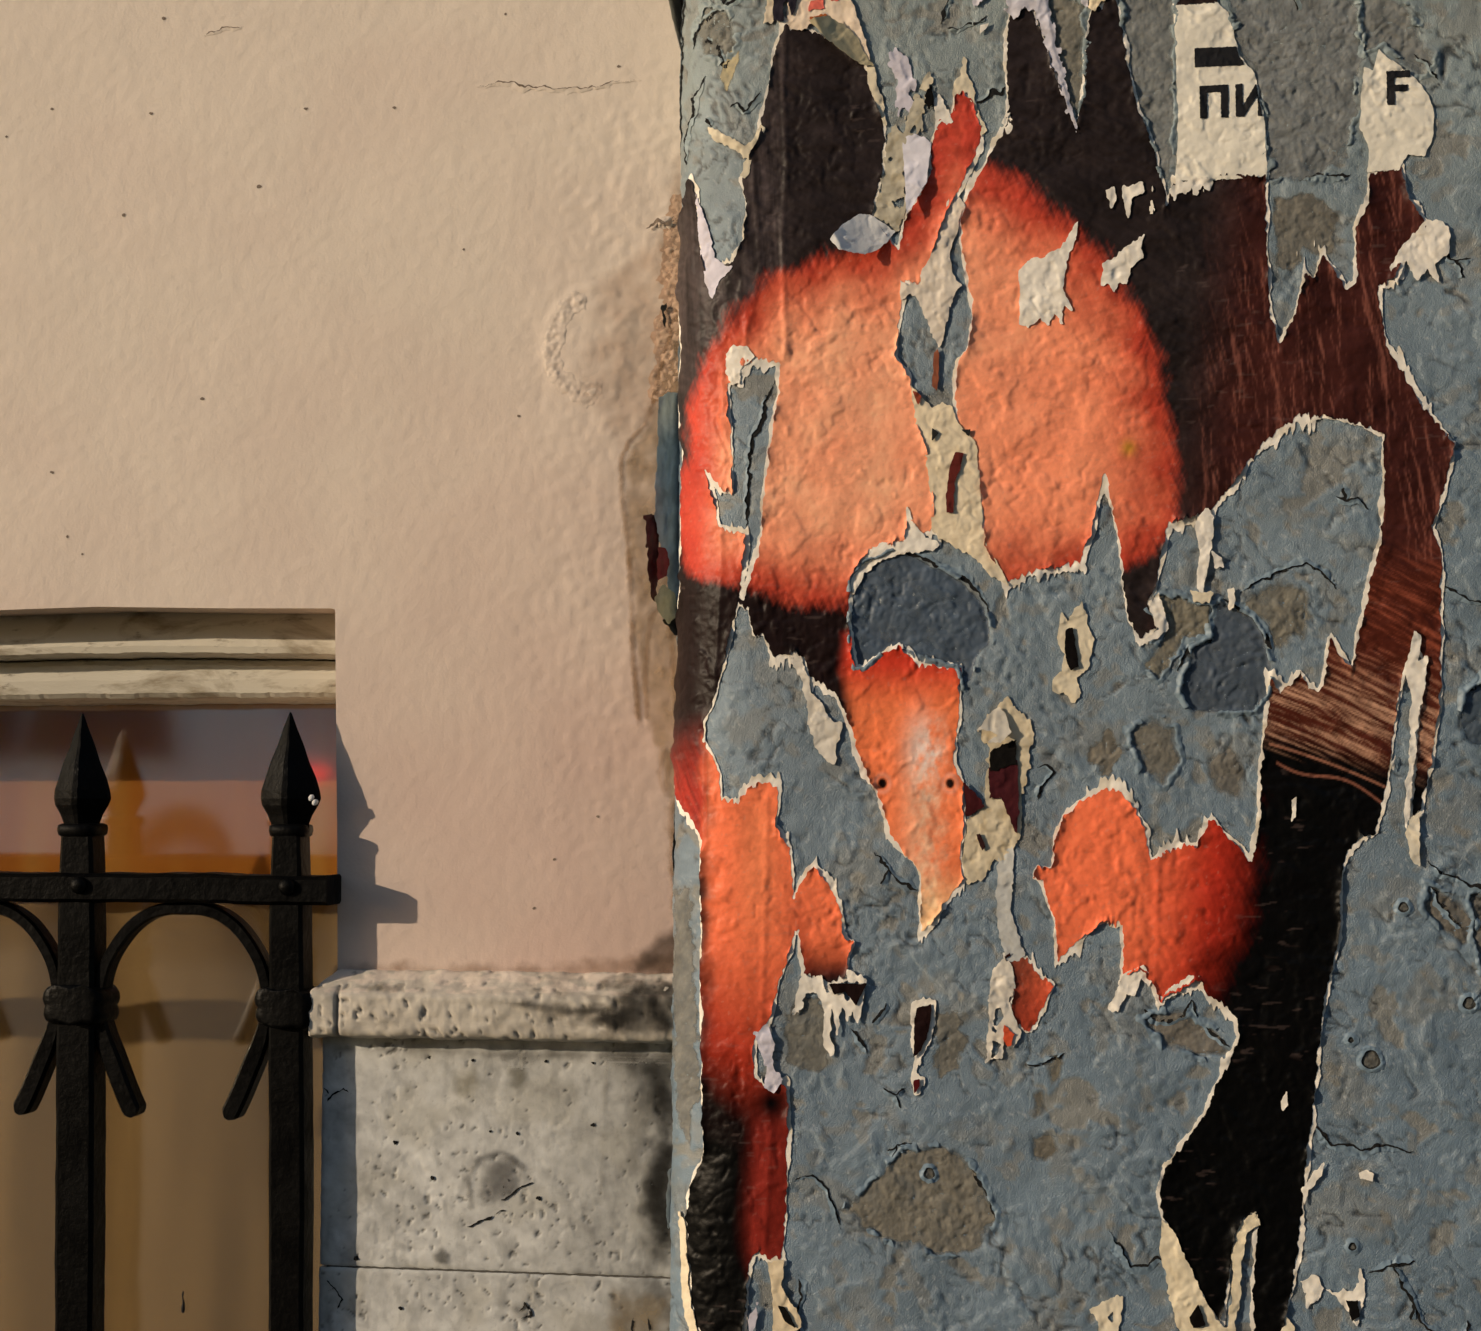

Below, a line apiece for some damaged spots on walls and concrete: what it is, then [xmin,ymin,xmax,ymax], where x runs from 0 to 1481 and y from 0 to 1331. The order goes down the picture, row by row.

crack [679,0,763,165]
peeling [1048,0,1091,122]
peeling [1227,0,1440,270]
damp [627,535,668,598]
damp [634,665,676,790]
damp [662,625,677,643]
peeling [846,548,996,692]
peeling [1087,584,1311,795]
crack [874,853,917,890]
crack [1427,861,1481,929]
damp [647,1145,673,1240]
crack [1369,1253,1471,1331]